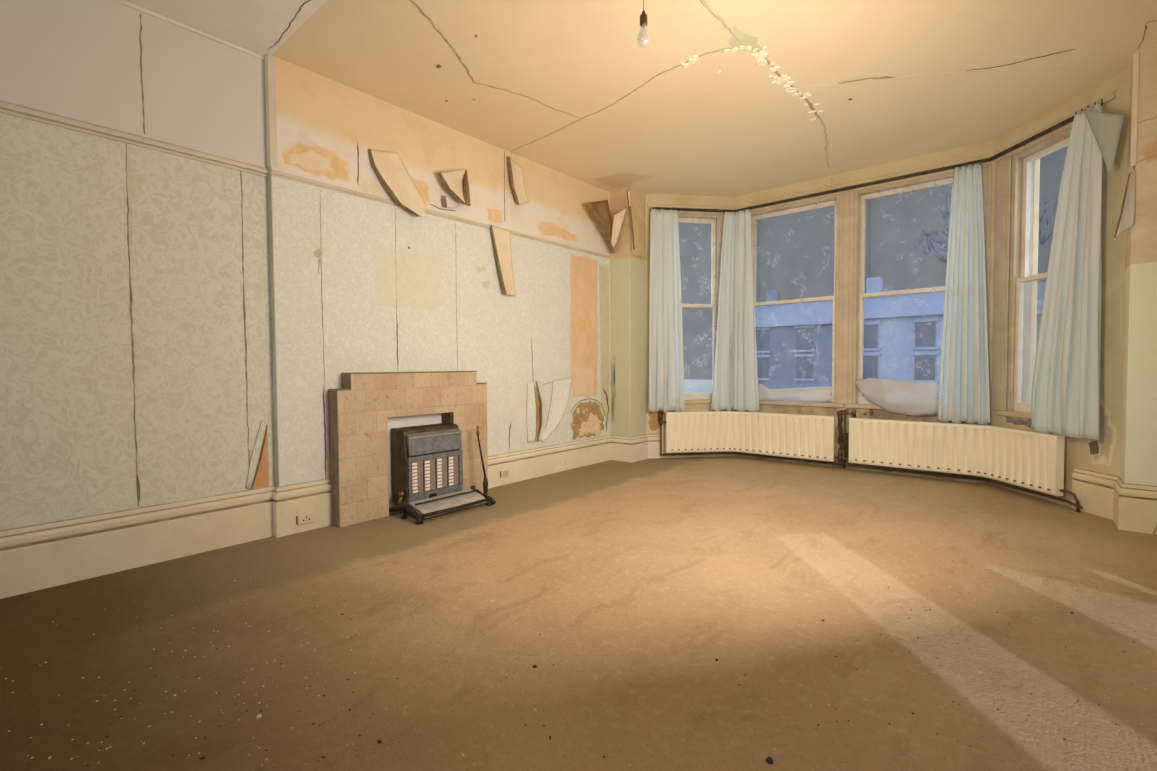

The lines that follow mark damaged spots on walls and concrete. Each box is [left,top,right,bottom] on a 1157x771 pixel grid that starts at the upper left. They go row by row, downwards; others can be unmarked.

crack [409,0,1076,181]
flaking render [484,205,610,442]
flaking render [246,420,269,489]